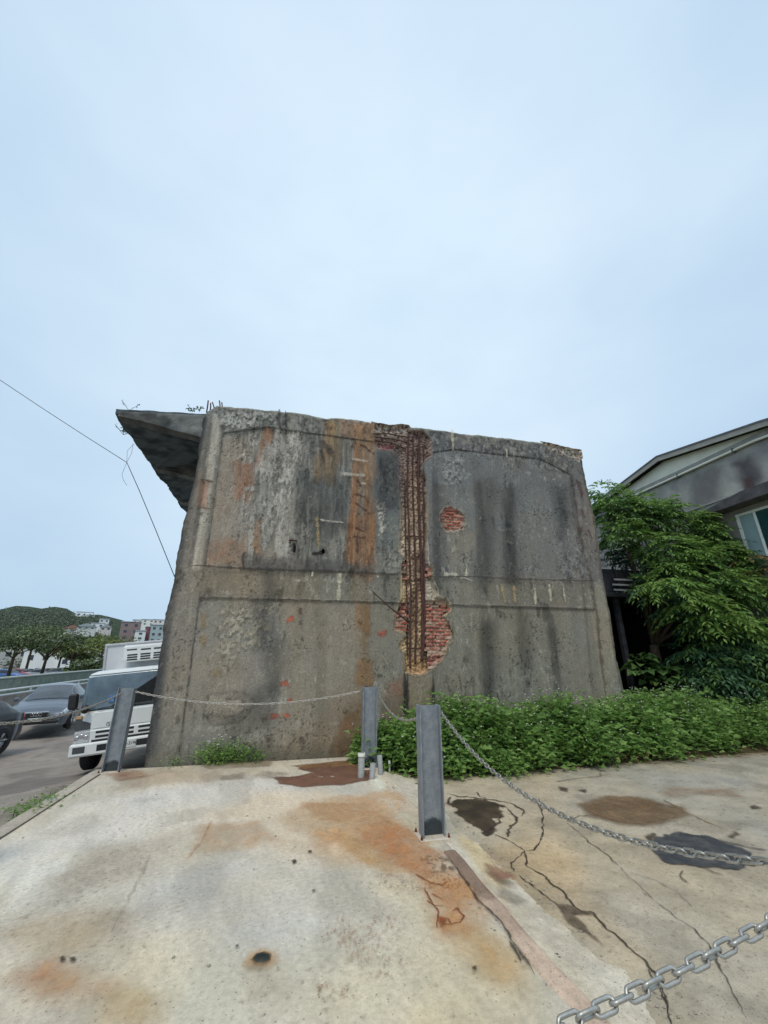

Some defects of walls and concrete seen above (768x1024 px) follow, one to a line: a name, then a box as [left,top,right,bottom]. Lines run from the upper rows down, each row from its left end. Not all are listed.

spalling [370,421,467,677]
damp [447,792,525,837]
damp [580,796,684,825]
corrosion [416,856,466,931]
crack [456,867,534,973]
crack [493,798,746,1024]